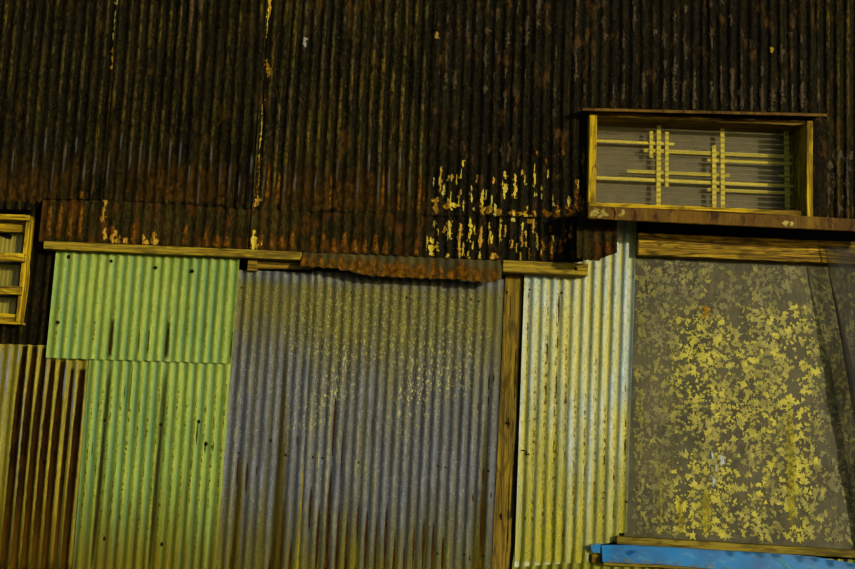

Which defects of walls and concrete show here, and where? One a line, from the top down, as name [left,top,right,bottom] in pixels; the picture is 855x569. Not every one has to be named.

rust [45,205,498,282]
rust [256,165,405,212]
rust [417,174,449,212]
peeling [426,160,554,260]
rust [480,153,586,259]
rust [0,307,227,569]
rust [236,458,258,491]
rust [308,399,444,569]
rust [268,511,292,569]